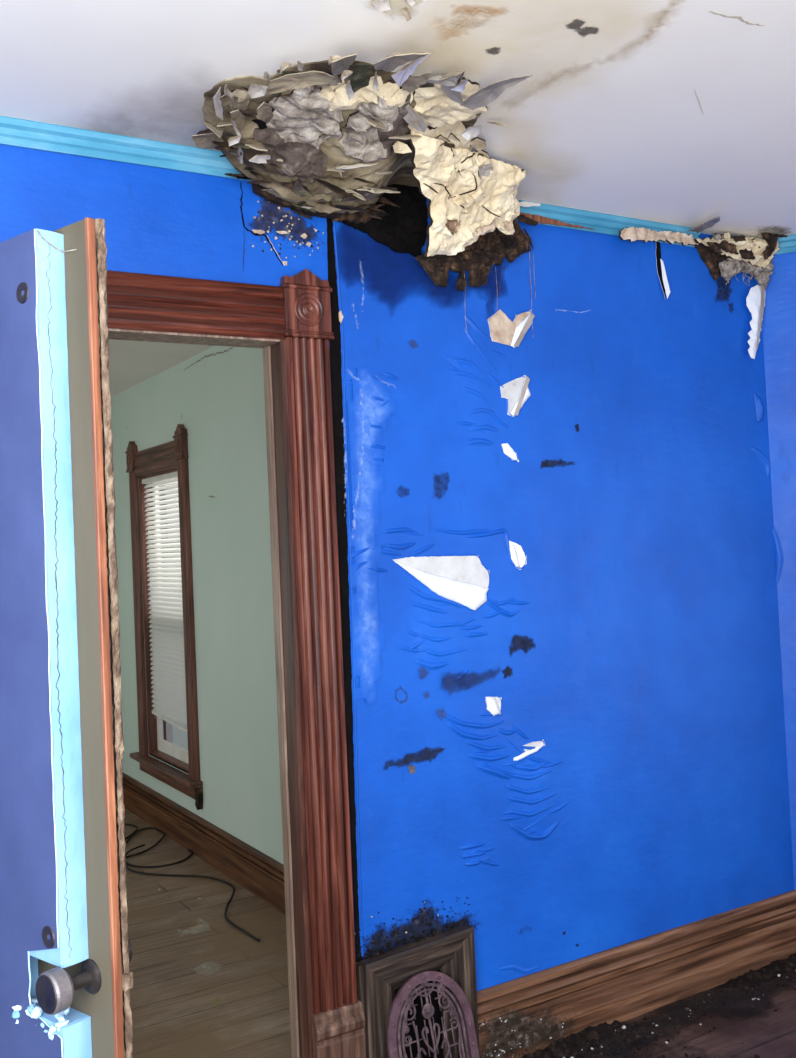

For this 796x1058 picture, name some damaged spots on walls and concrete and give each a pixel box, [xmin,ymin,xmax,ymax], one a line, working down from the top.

peeling [372,0,418,21]
water stain [284,0,710,207]
spalling [191,52,594,291]
spalling [619,216,787,289]
water stain [442,667,512,691]
water stain [510,635,535,654]